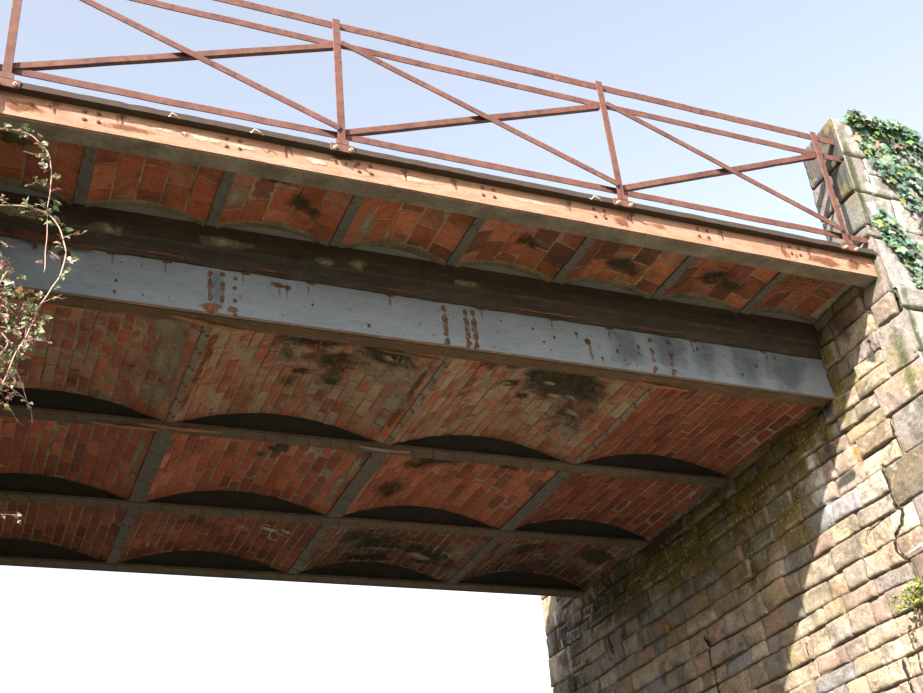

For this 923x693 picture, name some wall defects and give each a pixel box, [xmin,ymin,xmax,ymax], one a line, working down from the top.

corrosion [241,266,290,294]
corrosion [463,308,484,348]
leakage [277,335,416,428]
leakage [476,362,608,435]
crack [865,466,917,580]
crack [704,636,721,693]